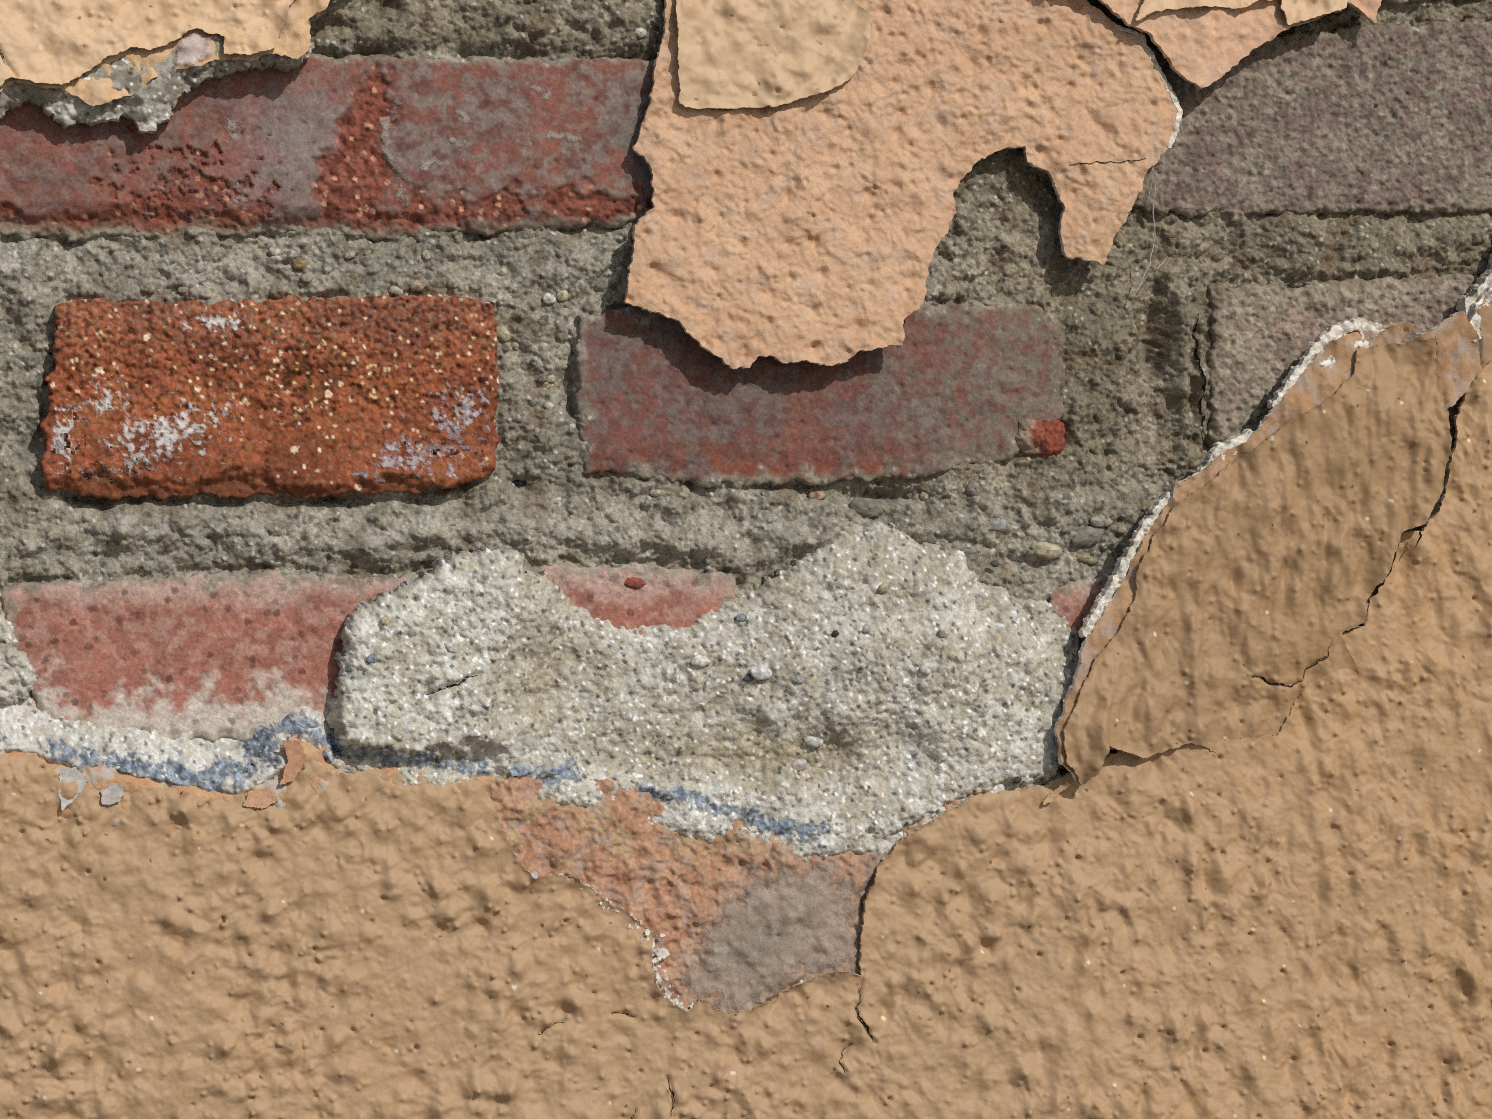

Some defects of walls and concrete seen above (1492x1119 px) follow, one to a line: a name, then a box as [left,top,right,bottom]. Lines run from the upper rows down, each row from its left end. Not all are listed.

peeling [175,33,213,65]
peeling [623,0,1382,369]
water stain [169,312,244,332]
water stain [51,373,235,481]
water stain [349,377,490,481]
crack [1252,529,1422,687]
spalling [0,521,1081,1016]
crack [839,988,874,1072]